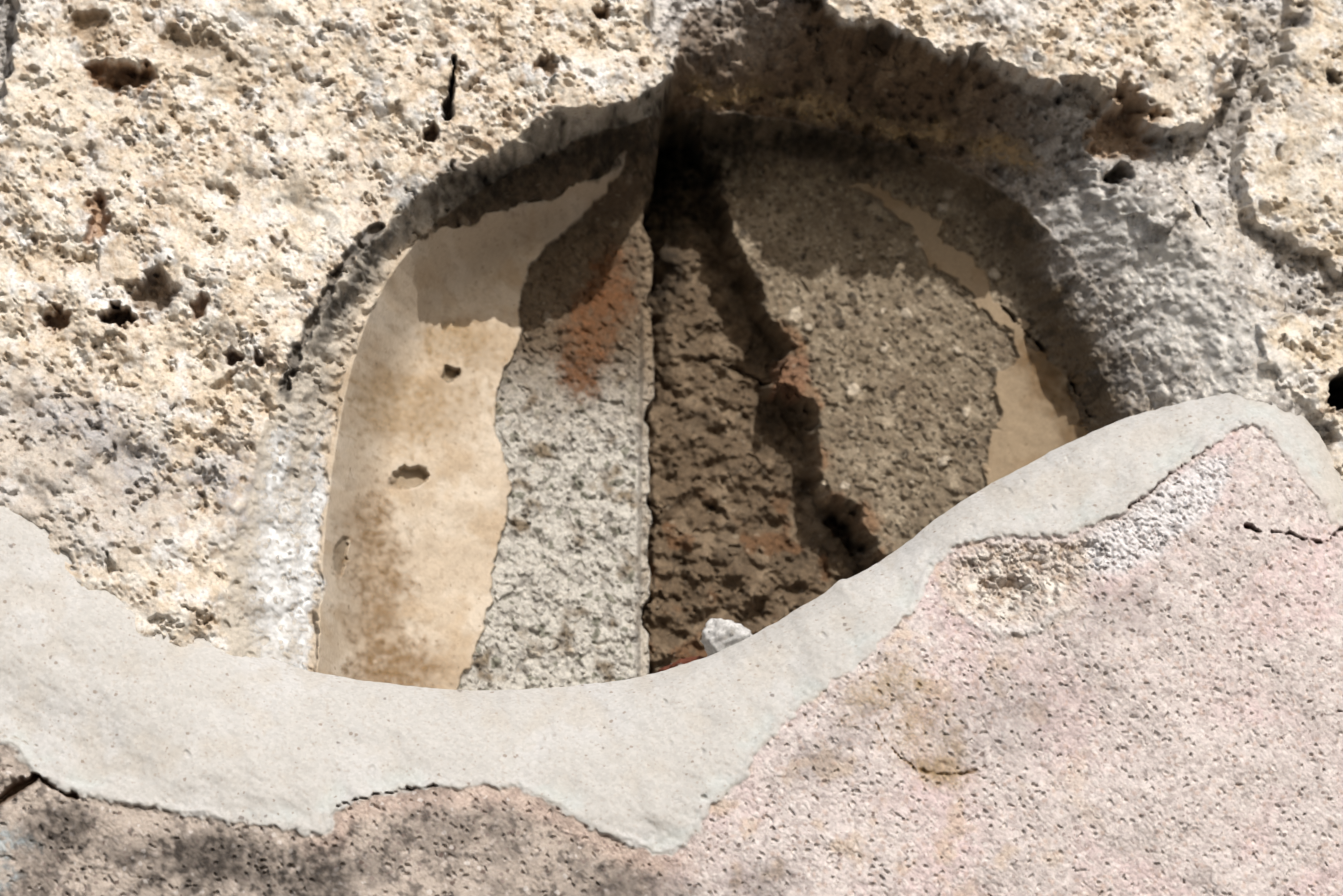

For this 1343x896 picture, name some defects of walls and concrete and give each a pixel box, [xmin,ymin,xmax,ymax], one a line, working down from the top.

hole [592,1,612,23]
hole [531,50,562,83]
hole [421,122,441,143]
hole [1103,162,1136,188]
hole [441,365,461,385]
flaking render [458,125,1096,691]
hole [388,464,432,491]
spalling [937,453,1237,632]
crack [1244,525,1343,546]
spalling [320,535,351,601]
crack [0,732,80,807]